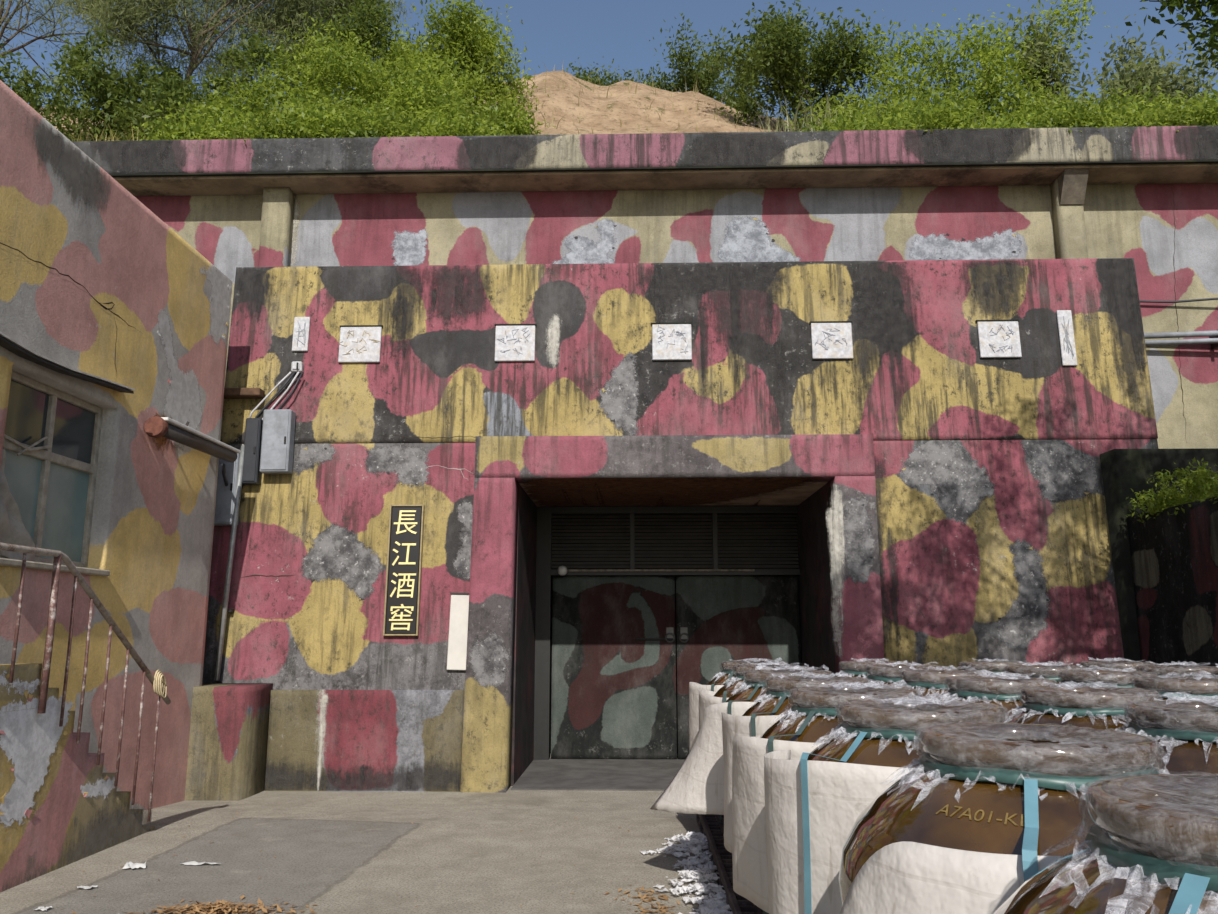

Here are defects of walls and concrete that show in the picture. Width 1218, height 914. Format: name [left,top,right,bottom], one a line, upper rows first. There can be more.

crack [0,243,139,372]
leakage [391,266,490,365]
leakage [548,315,560,365]
leakage [641,263,786,423]
leakage [855,262,919,416]
leakage [964,261,1025,318]
leakage [1099,258,1145,400]
peeling [0,670,73,828]